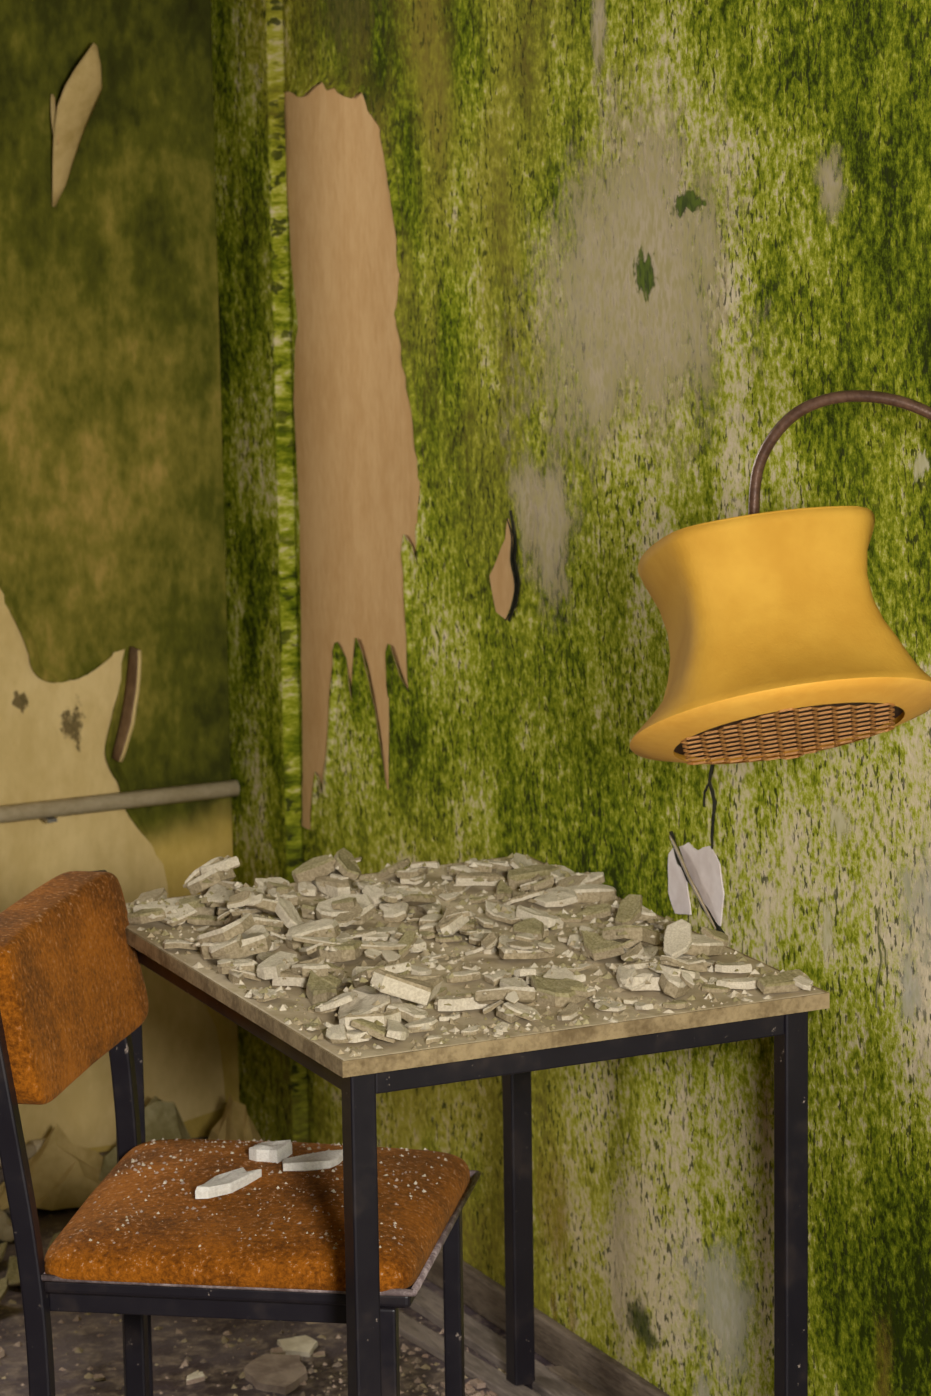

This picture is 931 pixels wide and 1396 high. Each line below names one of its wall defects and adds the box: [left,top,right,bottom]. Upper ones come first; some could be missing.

peeling [51,43,103,207]
water stain [818,149,842,218]
water stain [507,0,736,612]
peeling [283,73,424,831]
peeling [489,510,520,621]
peeling [0,578,184,913]
peeling [668,831,725,933]
crack [875,907,887,1008]
peeling [18,1051,116,1148]
peeling [140,964,225,1122]
water stain [628,1302,656,1350]
water stain [689,1247,755,1375]